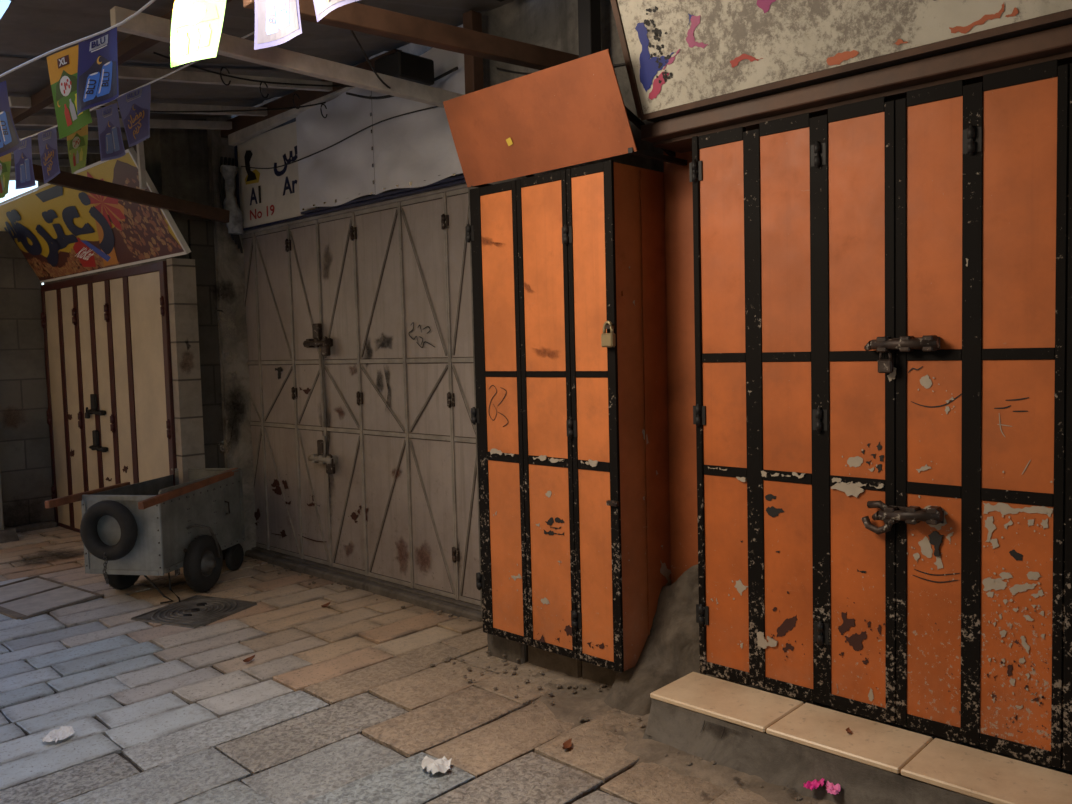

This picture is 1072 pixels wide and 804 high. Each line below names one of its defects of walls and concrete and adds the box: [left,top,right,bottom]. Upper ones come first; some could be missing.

peeling [918,375,955,415]
spalling [761,471,806,479]
spalling [831,442,884,497]
peeling [534,517,564,535]
peeling [765,494,784,517]
peeling [907,495,956,575]
peeling [757,607,805,661]
peeling [838,602,885,665]
peeling [982,503,1053,723]